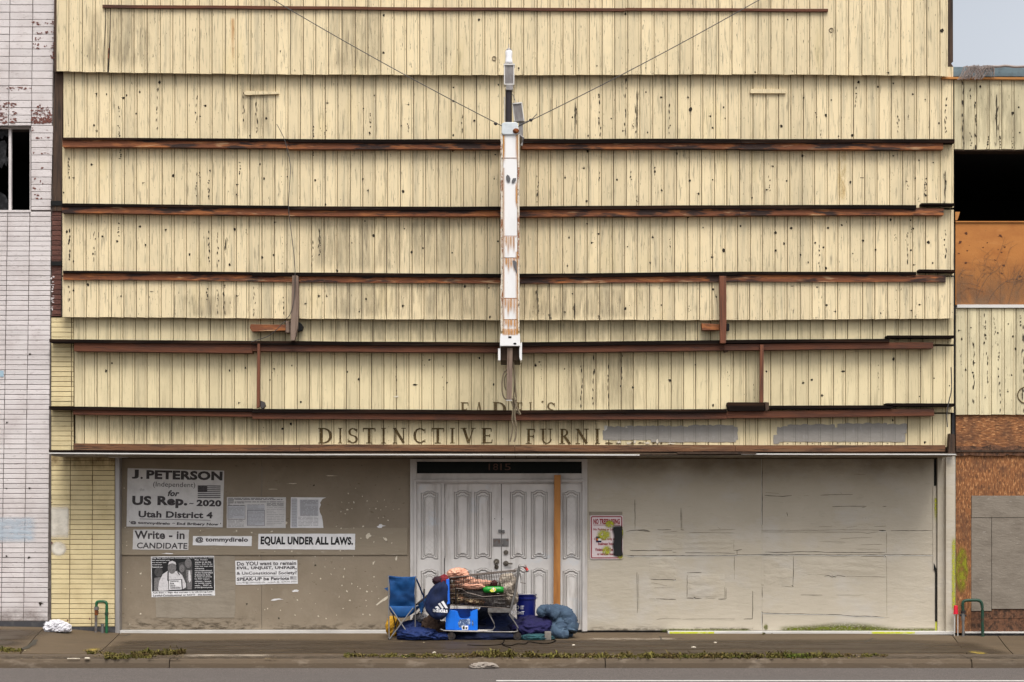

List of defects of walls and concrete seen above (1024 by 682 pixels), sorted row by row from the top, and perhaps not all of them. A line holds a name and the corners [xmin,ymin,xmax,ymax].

peeling [0,87,31,124]
peeling [31,105,52,139]
corrosion [503,236,518,335]